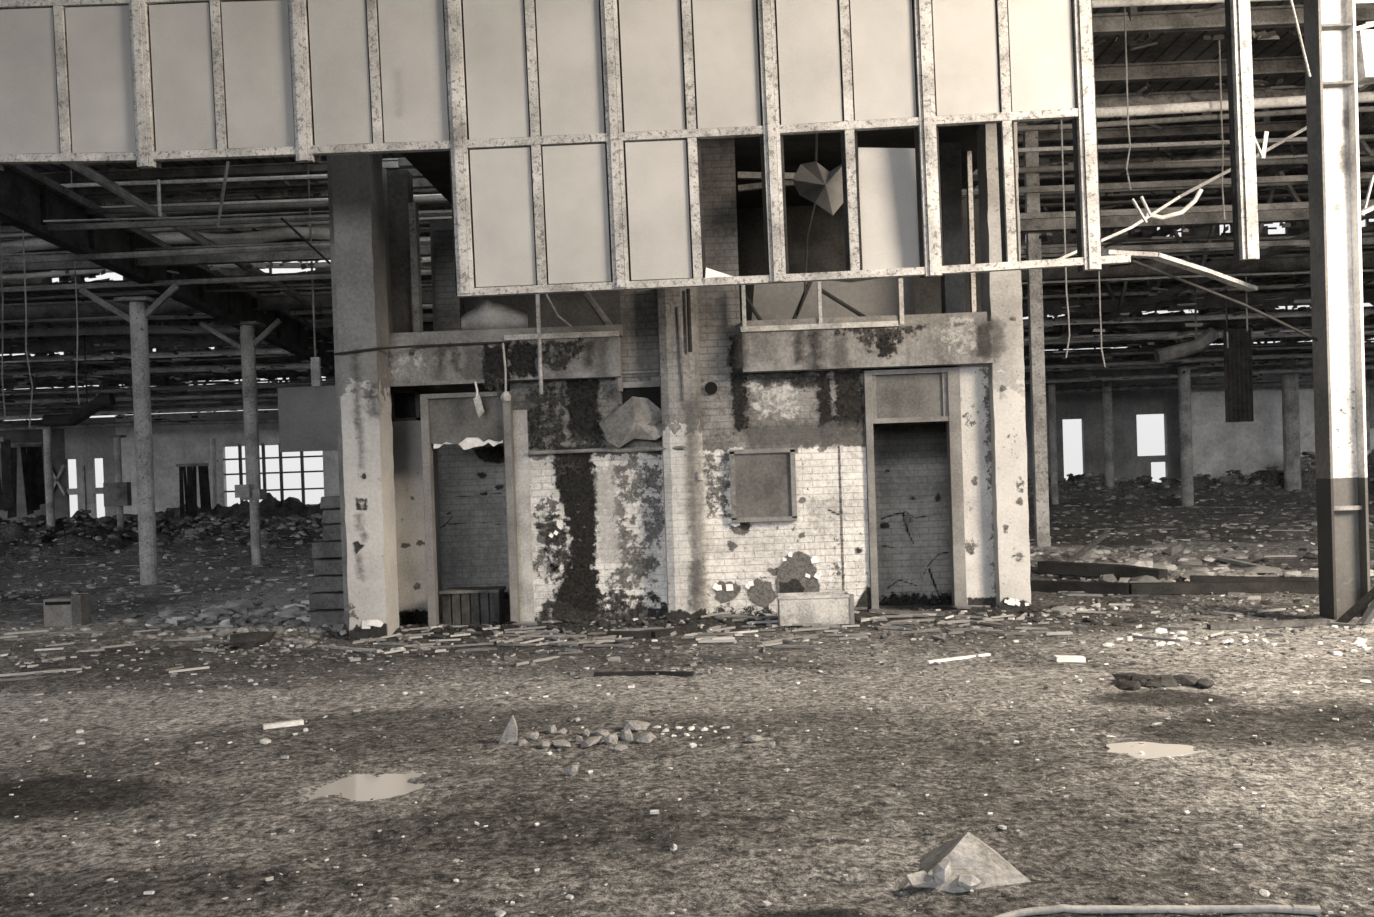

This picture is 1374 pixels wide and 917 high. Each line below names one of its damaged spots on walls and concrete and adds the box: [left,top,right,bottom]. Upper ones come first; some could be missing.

water stain [726,324,947,458]
water stain [436,338,668,624]
peeling [596,451,665,590]
spalling [665,532,863,619]